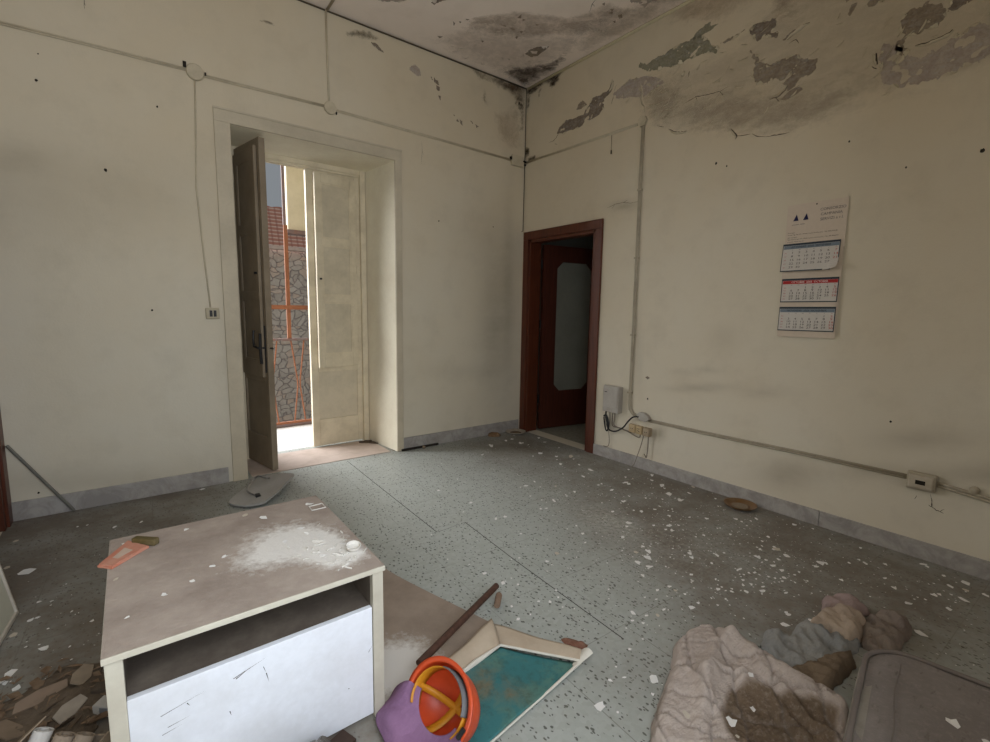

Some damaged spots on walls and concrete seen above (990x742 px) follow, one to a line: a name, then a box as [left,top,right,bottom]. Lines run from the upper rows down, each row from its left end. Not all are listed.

water stain [498,53,567,107]
peeling [557,18,818,134]
peeling [878,0,990,88]